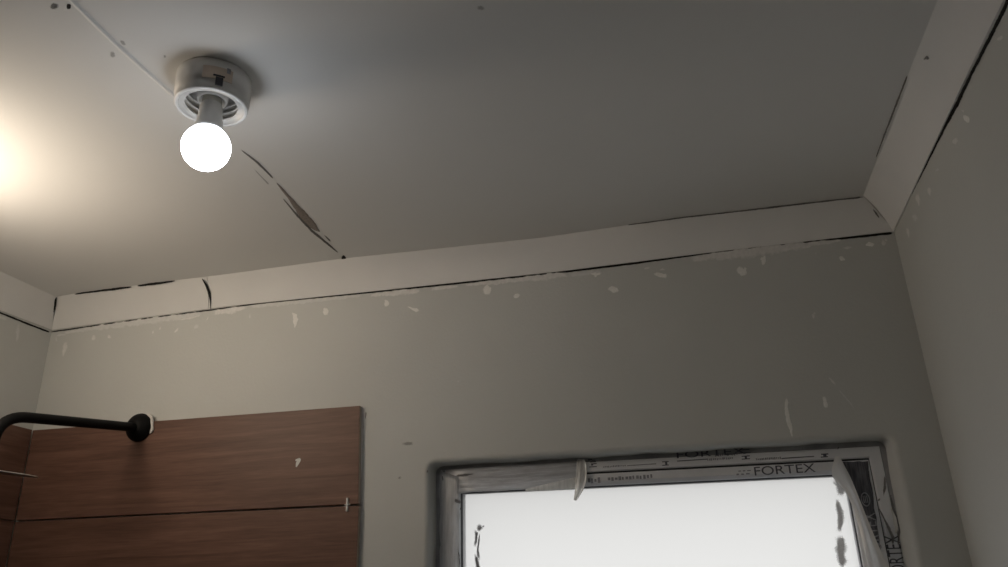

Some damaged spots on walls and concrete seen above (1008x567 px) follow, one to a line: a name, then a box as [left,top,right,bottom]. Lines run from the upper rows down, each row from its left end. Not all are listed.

crack [876,77,907,157]
crack [243,151,346,259]
crack [0,247,756,332]